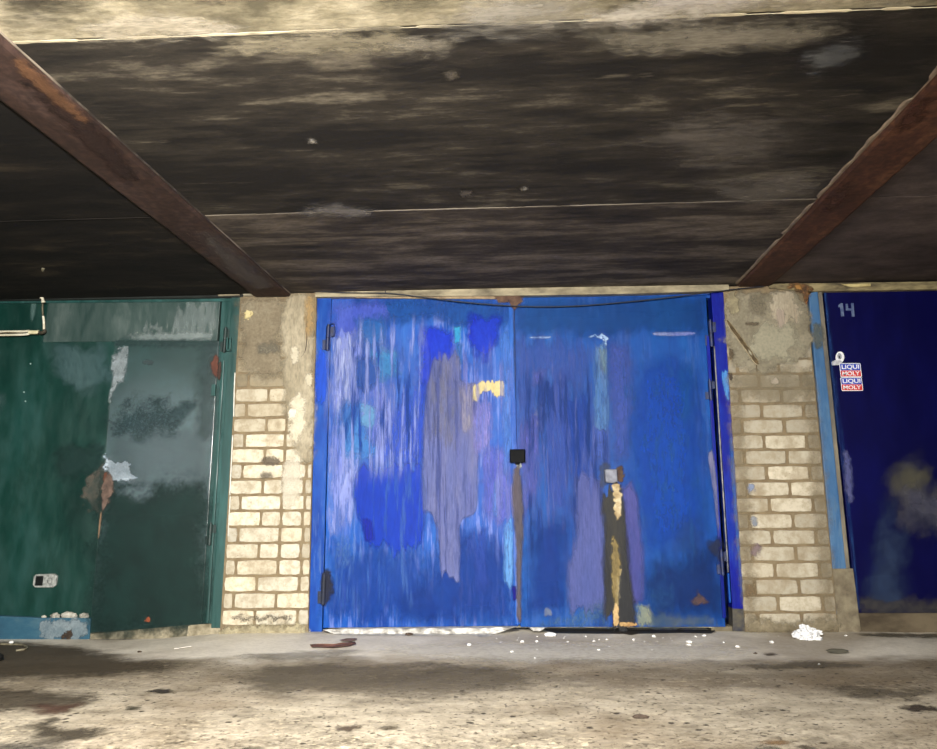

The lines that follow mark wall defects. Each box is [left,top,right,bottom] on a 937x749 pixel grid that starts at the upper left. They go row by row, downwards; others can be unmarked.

water stain [81,17,232,39]
water stain [229,29,446,55]
water stain [474,5,541,23]
water stain [599,0,829,55]
water stain [814,46,857,67]
flaking render [726,291,739,314]
spalling [290,347,299,364]
peeling [109,346,129,402]
spalling [288,393,306,443]
peeling [103,453,137,481]
corrosion [82,464,114,538]
corrosion [510,463,523,622]